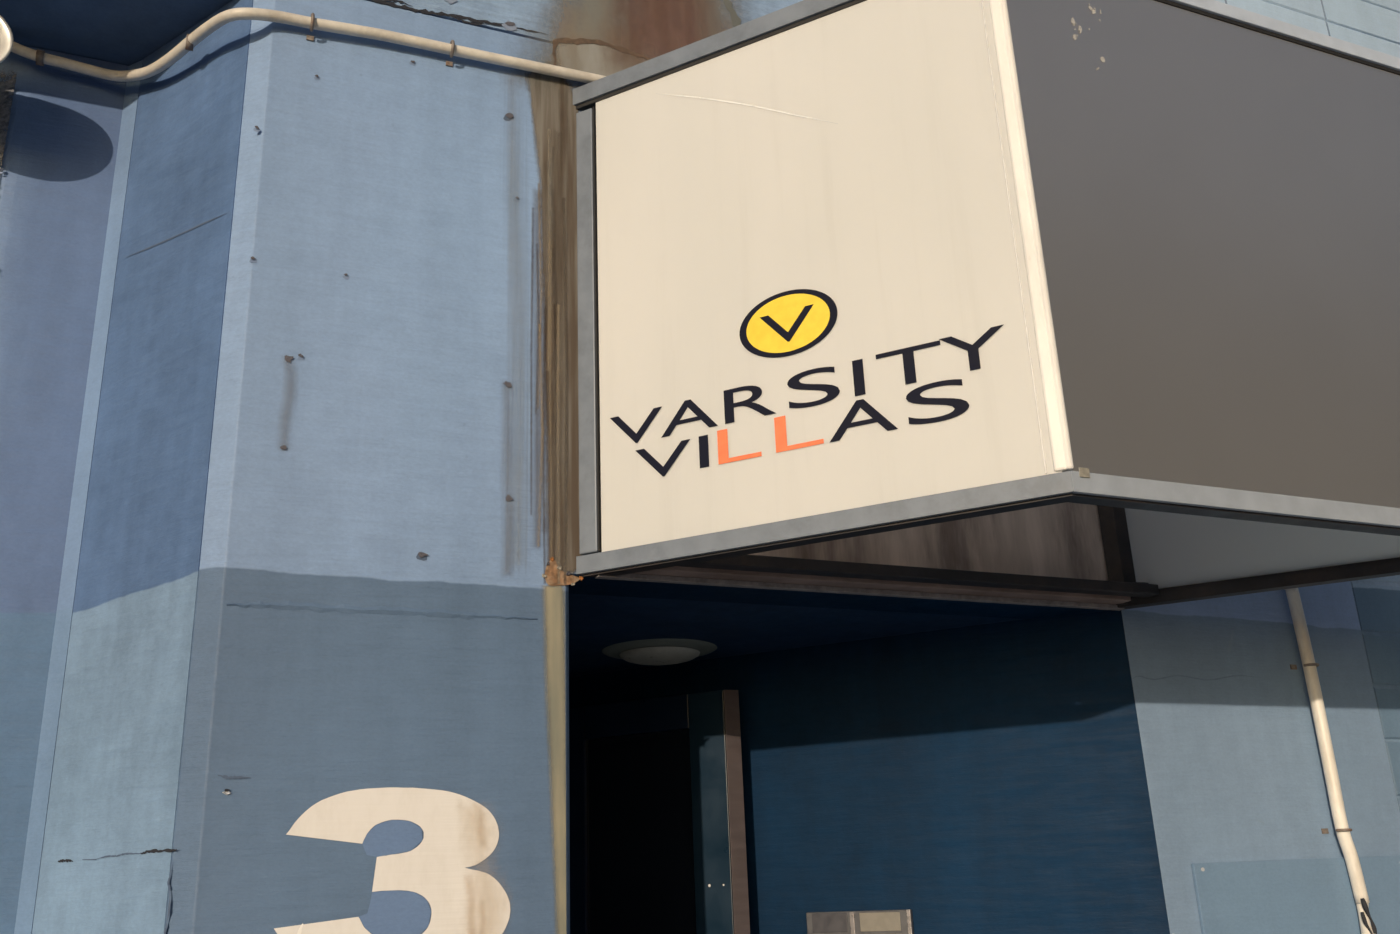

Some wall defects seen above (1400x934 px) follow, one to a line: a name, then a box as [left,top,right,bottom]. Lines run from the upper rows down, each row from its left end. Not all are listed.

crack [371,0,548,35]
crack [58,849,177,934]